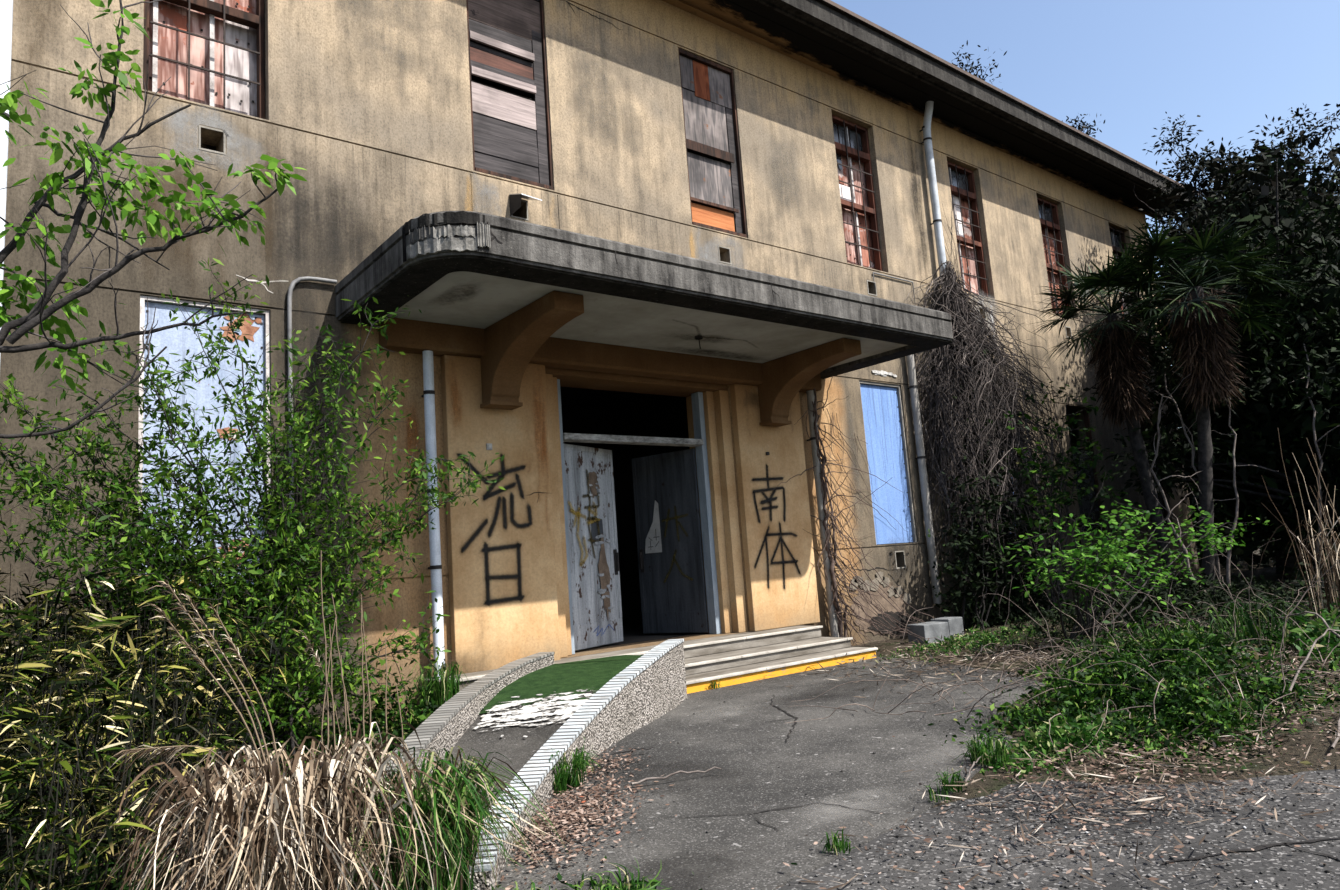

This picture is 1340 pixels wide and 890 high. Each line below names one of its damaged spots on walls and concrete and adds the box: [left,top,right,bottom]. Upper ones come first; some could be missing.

spalling [402,211,491,263]
peeling [587,471,601,498]
peeling [595,533,615,617]